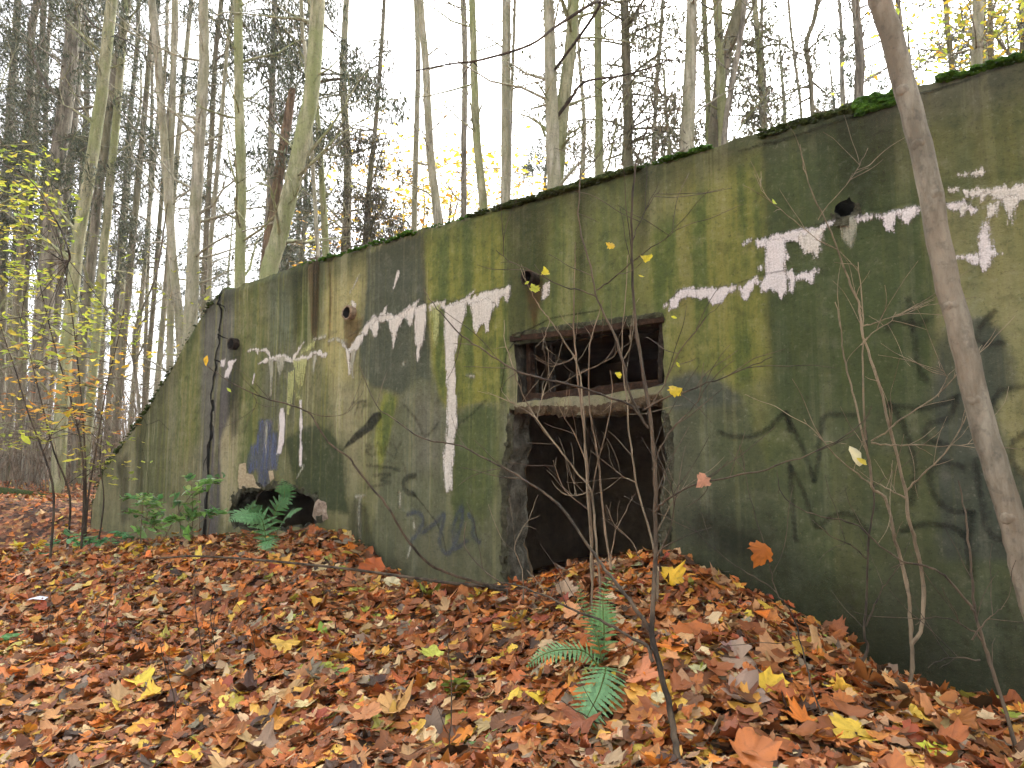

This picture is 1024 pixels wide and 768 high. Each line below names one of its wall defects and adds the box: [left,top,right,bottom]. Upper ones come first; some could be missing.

leakage [663,205,920,311]
leakage [946,167,1024,272]
crack [202,292,228,535]
spalling [230,463,328,523]
leakage [248,285,510,492]
spalling [499,393,675,585]